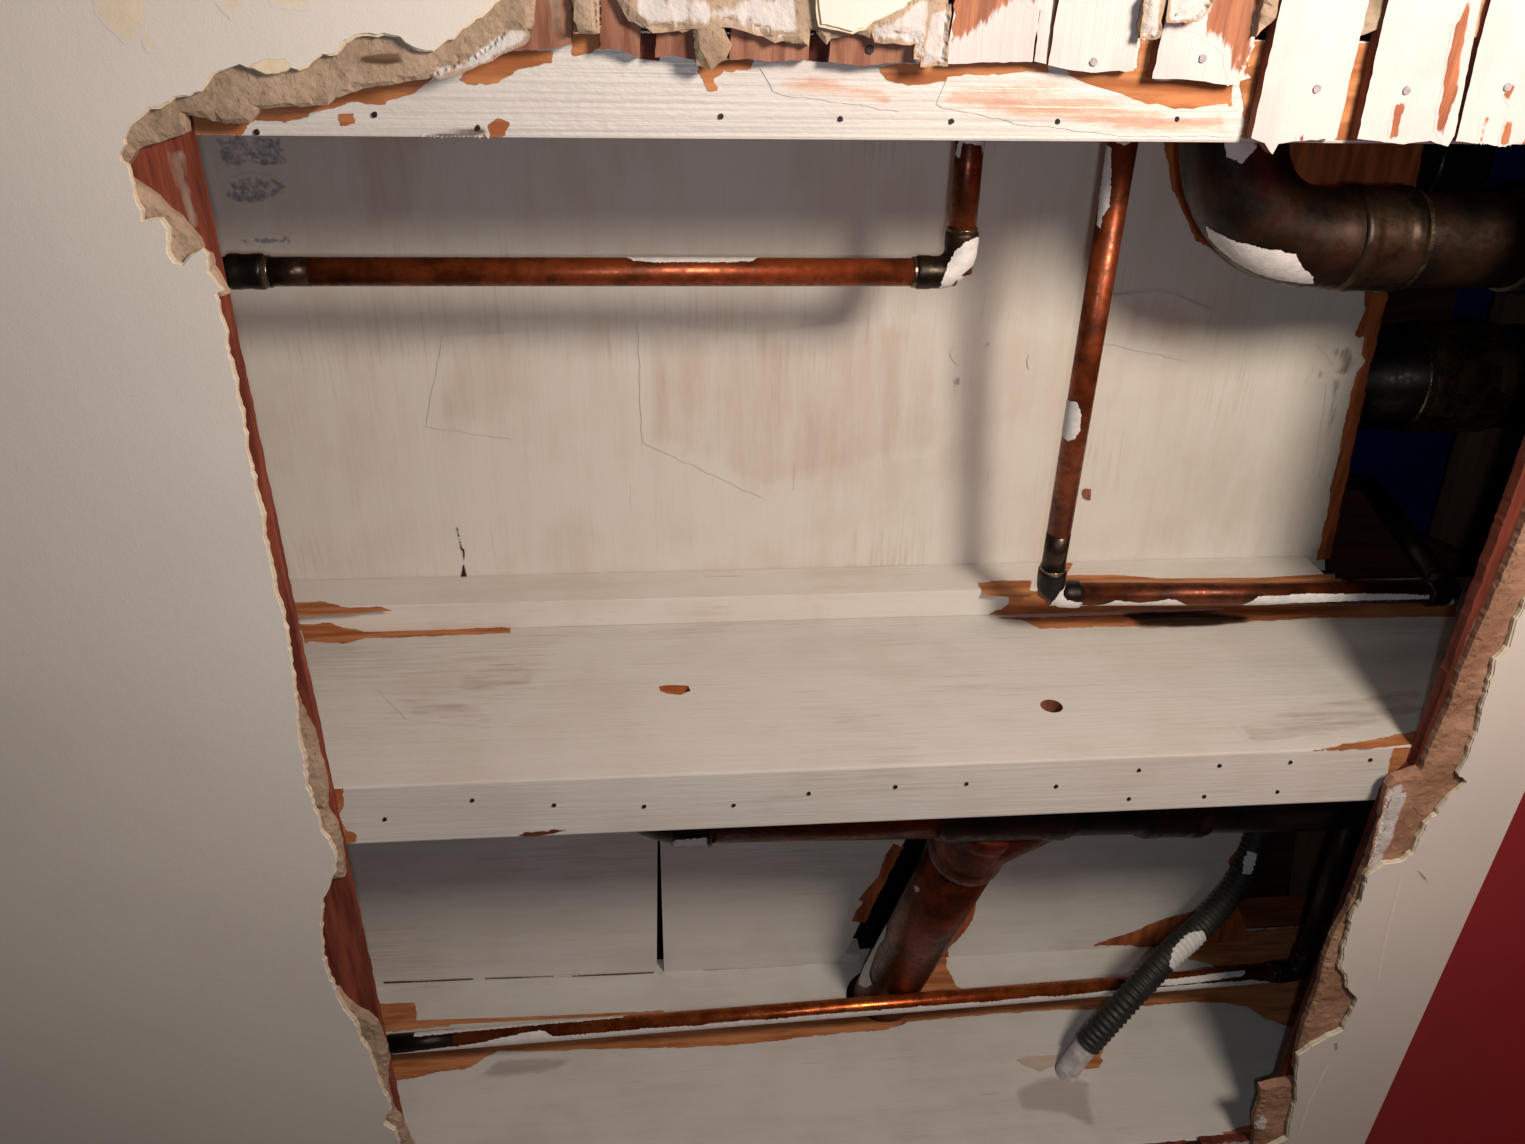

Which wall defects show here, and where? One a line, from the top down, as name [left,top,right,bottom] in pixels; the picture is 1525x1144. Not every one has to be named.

flaking render [122,0,1279,297]
peeling [1290,0,1472,188]
peeling [1476,80,1525,147]
peeling [1066,290,1426,583]
peeling [295,601,511,644]
crack [457,528,467,577]
peeling [978,579,1462,629]
flaking render [298,692,357,879]
flaking render [1143,505,1525,1144]
peeling [921,904,976,992]
peeling [1093,910,1198,947]
peeling [337,985,1113,1144]